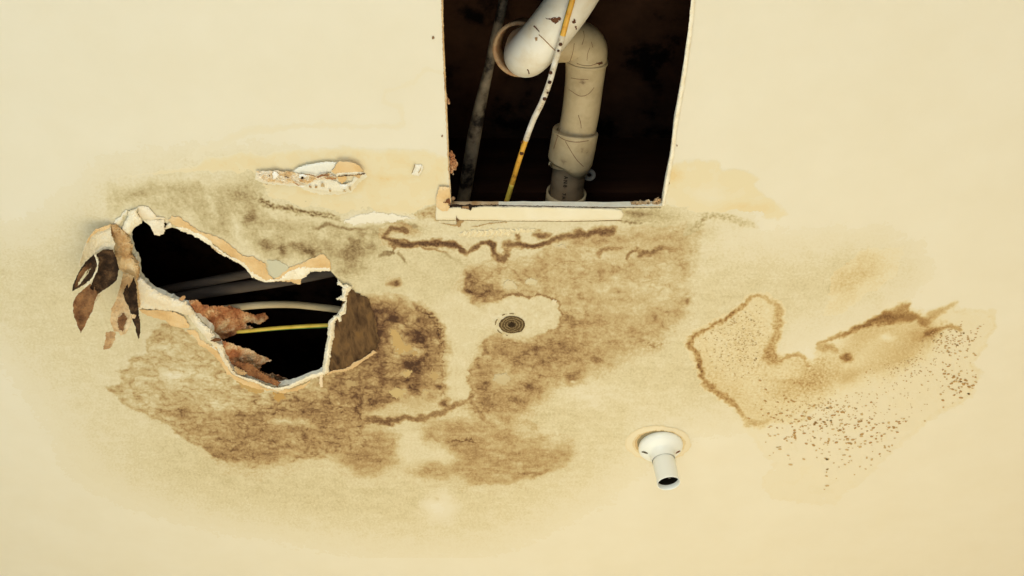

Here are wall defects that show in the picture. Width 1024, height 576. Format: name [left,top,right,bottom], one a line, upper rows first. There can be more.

leakage [137,66,450,217]
peeling [137,206,165,220]
peeling [344,211,415,226]
flaking render [137,277,319,402]
leakage [0,140,998,558]